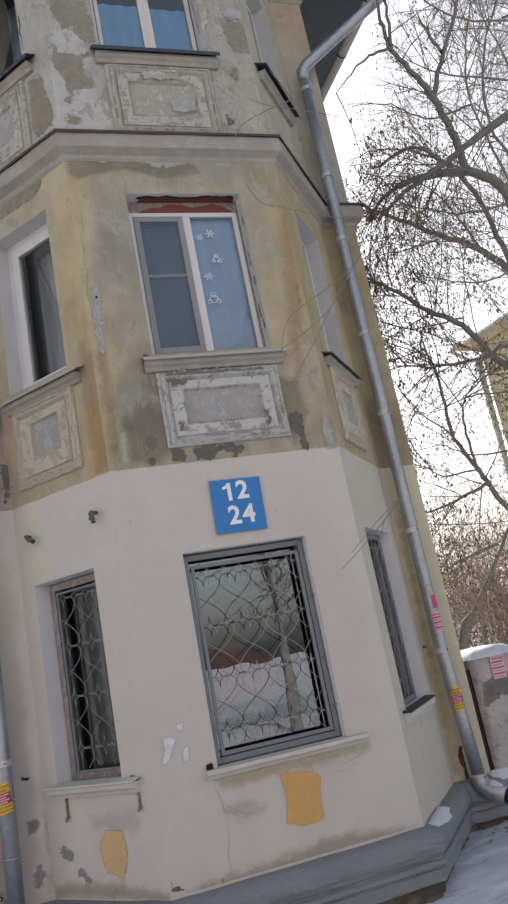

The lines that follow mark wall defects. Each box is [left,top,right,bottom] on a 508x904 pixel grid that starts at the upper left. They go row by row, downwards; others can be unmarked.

peeling [218,4,250,53]
peeling [50,0,95,124]
peeling [27,75,53,137]
peeling [60,846,74,862]
peeling [78,868,92,886]